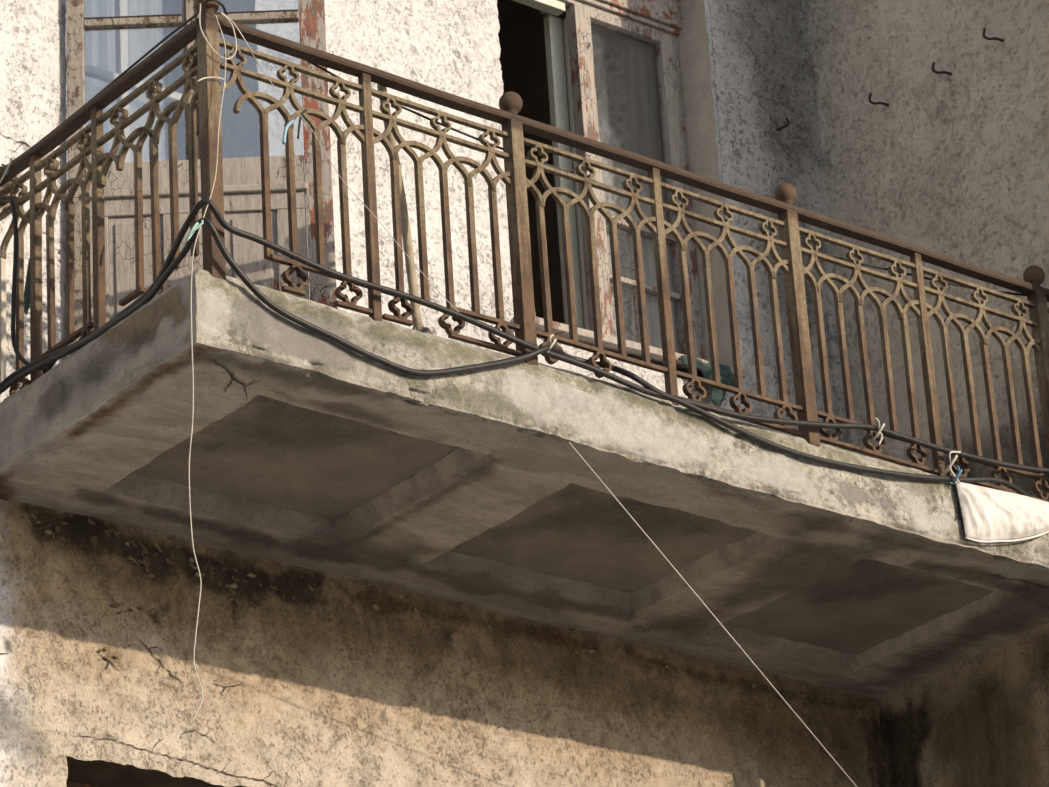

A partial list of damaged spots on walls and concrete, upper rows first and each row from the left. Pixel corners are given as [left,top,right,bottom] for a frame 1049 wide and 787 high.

leakage [510,371,713,467]
leakage [722,443,808,492]
crack [134,634,182,682]
leakage [869,704,930,787]